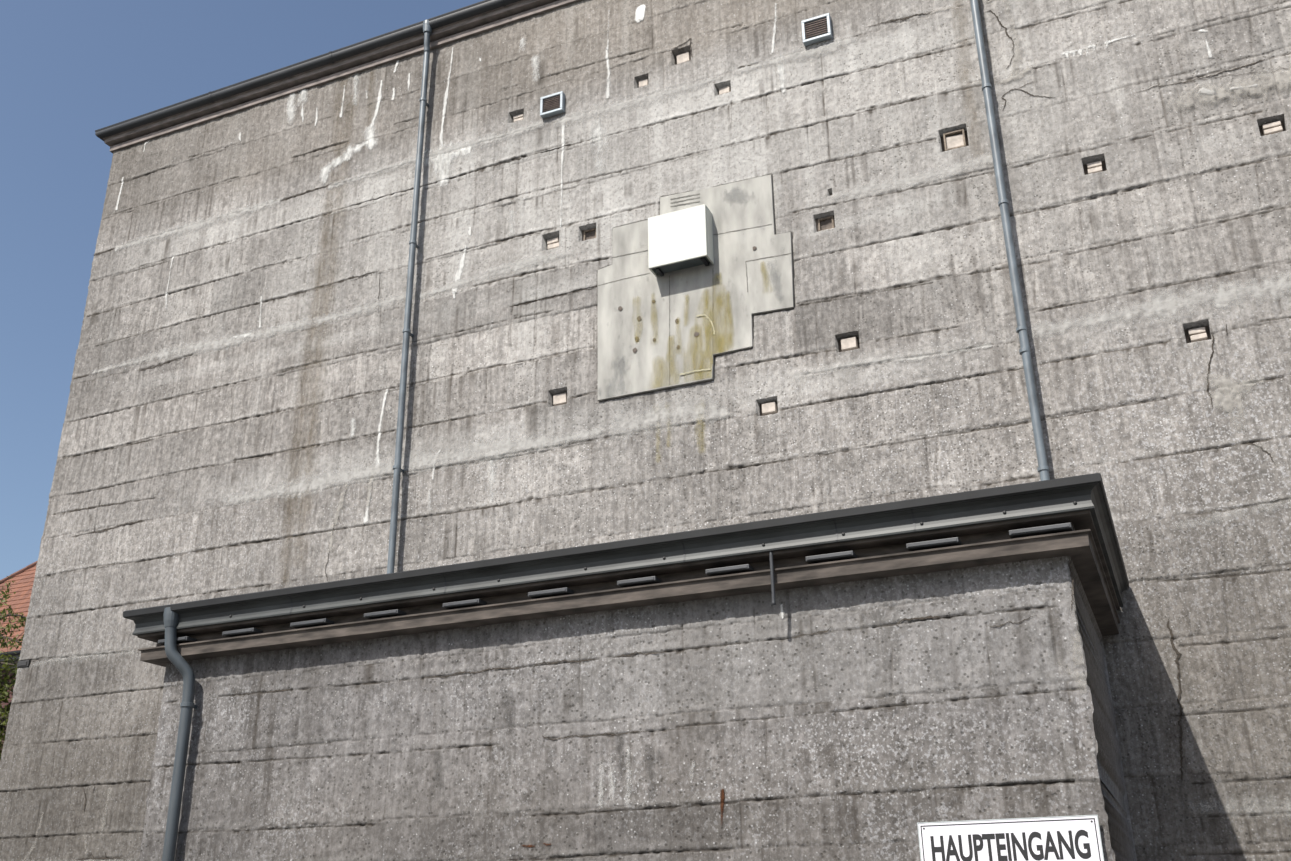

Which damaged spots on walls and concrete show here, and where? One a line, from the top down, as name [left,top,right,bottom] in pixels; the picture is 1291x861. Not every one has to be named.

leakage [287,89,318,126]
leakage [320,60,410,184]
crack [987,10,1055,110]
crack [1207,324,1227,409]
crack [1167,619,1183,780]